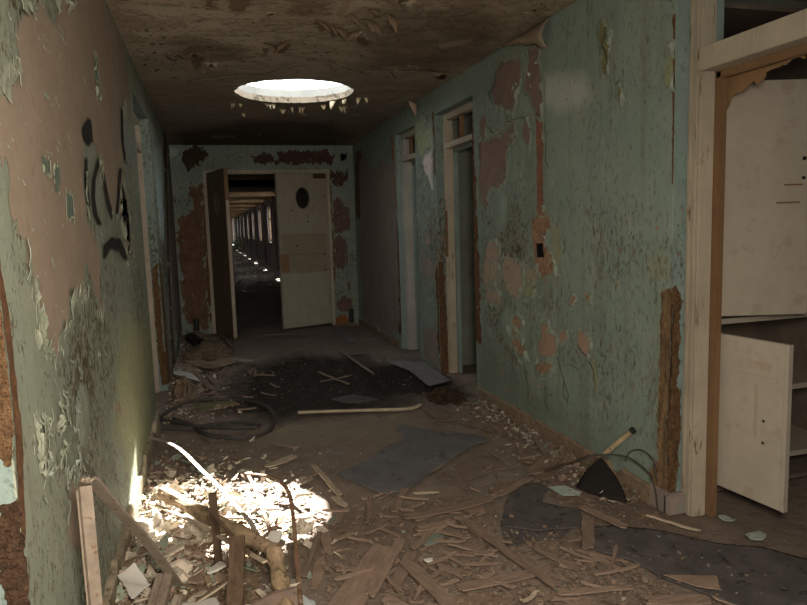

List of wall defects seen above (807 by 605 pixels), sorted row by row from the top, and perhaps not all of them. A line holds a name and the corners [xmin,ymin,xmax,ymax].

peeling [408,101,435,192]
peeling [0,0,212,415]
peeling [250,146,400,335]
spalling [480,205,558,309]
spalling [0,309,14,470]
crack [523,343,596,413]
spalling [0,500,34,605]